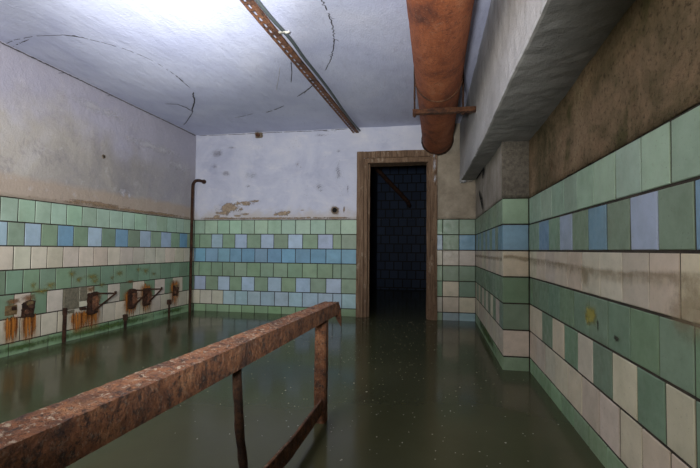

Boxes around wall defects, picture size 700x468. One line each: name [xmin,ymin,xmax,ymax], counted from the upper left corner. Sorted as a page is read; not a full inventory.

crack [321,0,338,70]
crack [0,35,344,136]
peeling [205,200,346,219]
corrosion [4,314,36,340]
corrosion [71,310,99,330]